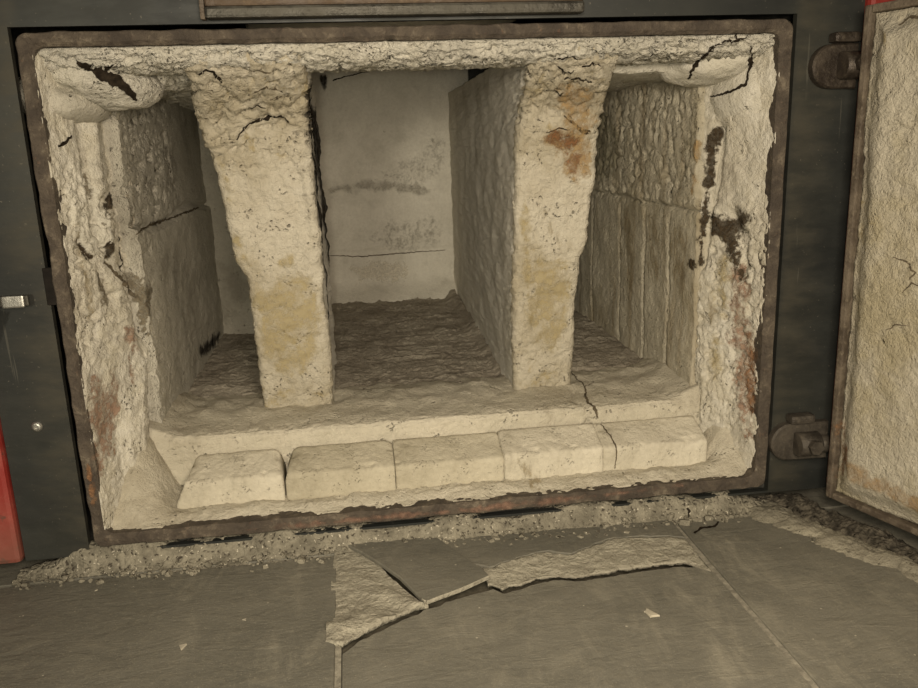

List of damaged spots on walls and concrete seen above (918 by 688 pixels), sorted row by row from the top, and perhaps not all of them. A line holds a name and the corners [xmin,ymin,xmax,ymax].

crack [76,61,137,101]
crack [236,69,291,140]
rust [545,84,597,180]
crack [687,34,754,97]
water stain [305,75,330,319]
crack [571,372,617,468]
spalling [325,549,429,648]
spalling [483,536,712,591]